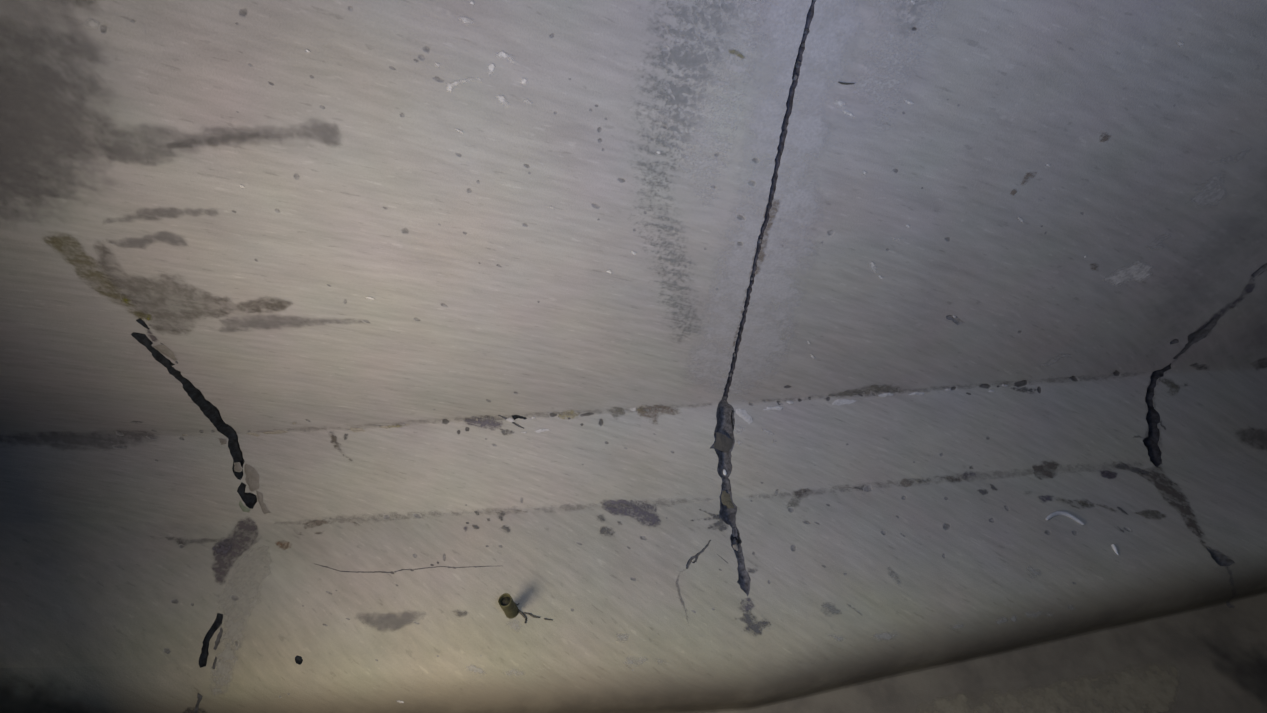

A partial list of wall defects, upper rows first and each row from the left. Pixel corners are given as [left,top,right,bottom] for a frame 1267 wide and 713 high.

crack [184,613,223,713]
crack [113,318,410,583]
damp [242,300,298,328]
crack [316,561,493,574]
crack [441,405,677,435]
damp [696,0,859,391]
crack [686,0,1079,634]
crack [1112,263,1267,566]